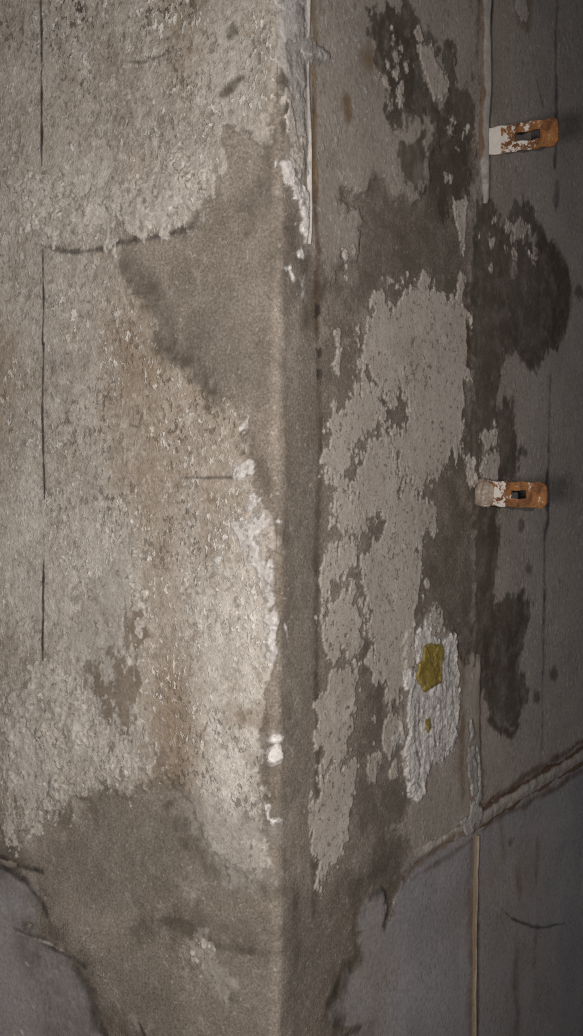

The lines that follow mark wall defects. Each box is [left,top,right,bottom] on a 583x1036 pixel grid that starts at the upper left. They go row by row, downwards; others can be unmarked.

crack [37,0,45,165]
peeling [416,40,450,102]
leakage [367,0,582,482]
peeling [512,216,531,244]
crack [39,257,47,499]
leakage [233,459,255,482]
crack [39,563,47,661]
spalling [5,76,501,1036]
leakage [230,494,288,663]
leakage [470,487,539,739]
efflorescence [391,616,461,803]
efflorescence [252,783,283,826]